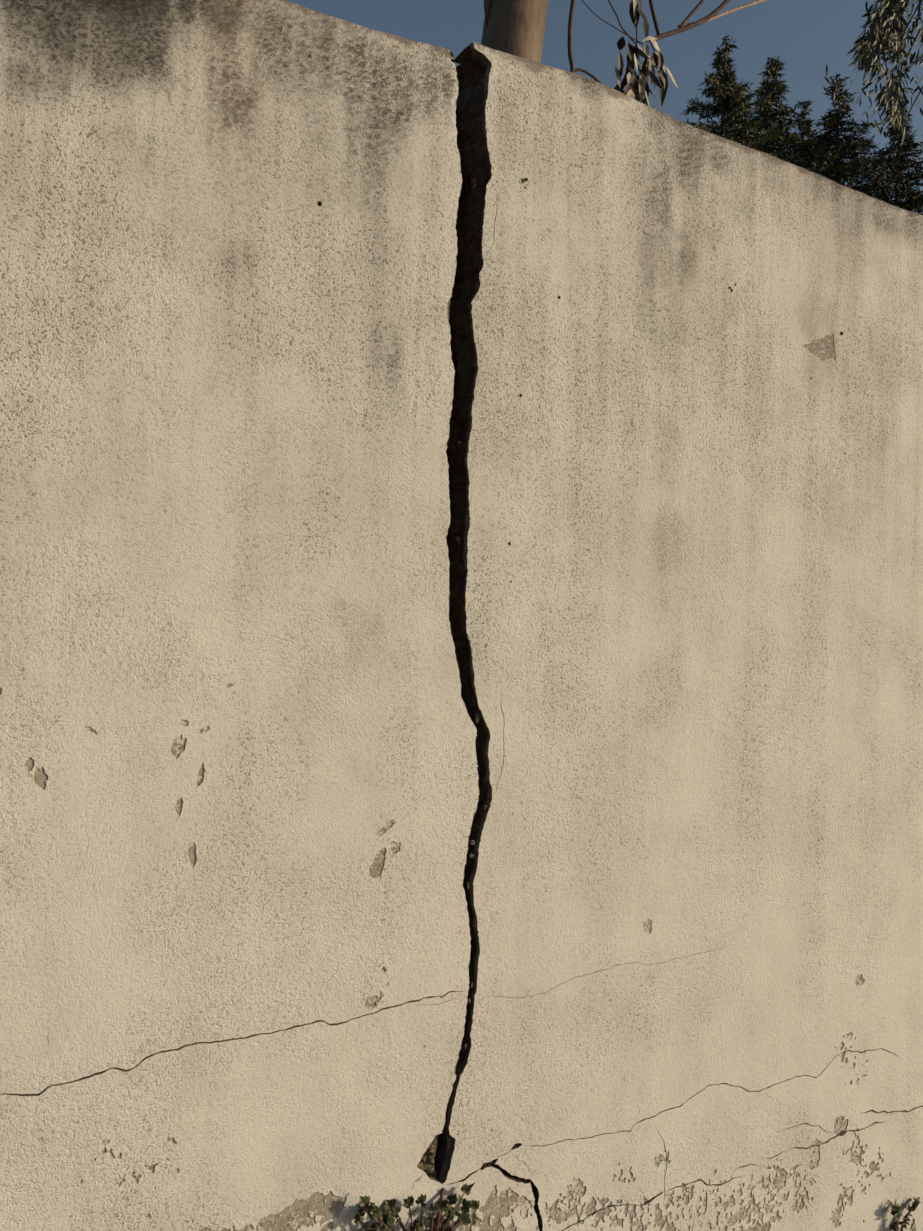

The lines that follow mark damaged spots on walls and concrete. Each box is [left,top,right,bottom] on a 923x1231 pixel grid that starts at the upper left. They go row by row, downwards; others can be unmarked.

spalling [801,334,836,361]
crack [0,42,543,1231]
peeling [171,719,210,760]
peeling [25,757,48,790]
peeling [197,762,205,787]
peeling [188,842,197,868]
crack [530,1048,899,1149]
peeling [94,1140,197,1197]
peeling [172,1191,349,1231]
peeling [439,1138,820,1231]
crack [562,1105,923,1231]
peeling [830,1116,891,1228]